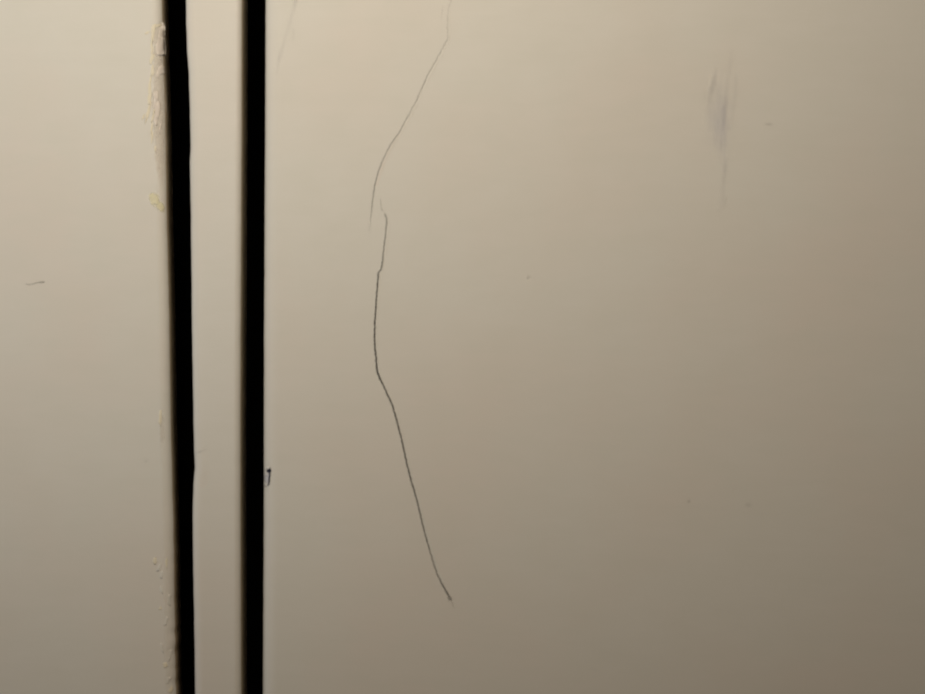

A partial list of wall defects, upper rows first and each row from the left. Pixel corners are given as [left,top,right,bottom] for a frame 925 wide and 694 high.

peeling [142,22,166,151]
crack [374,217,448,594]